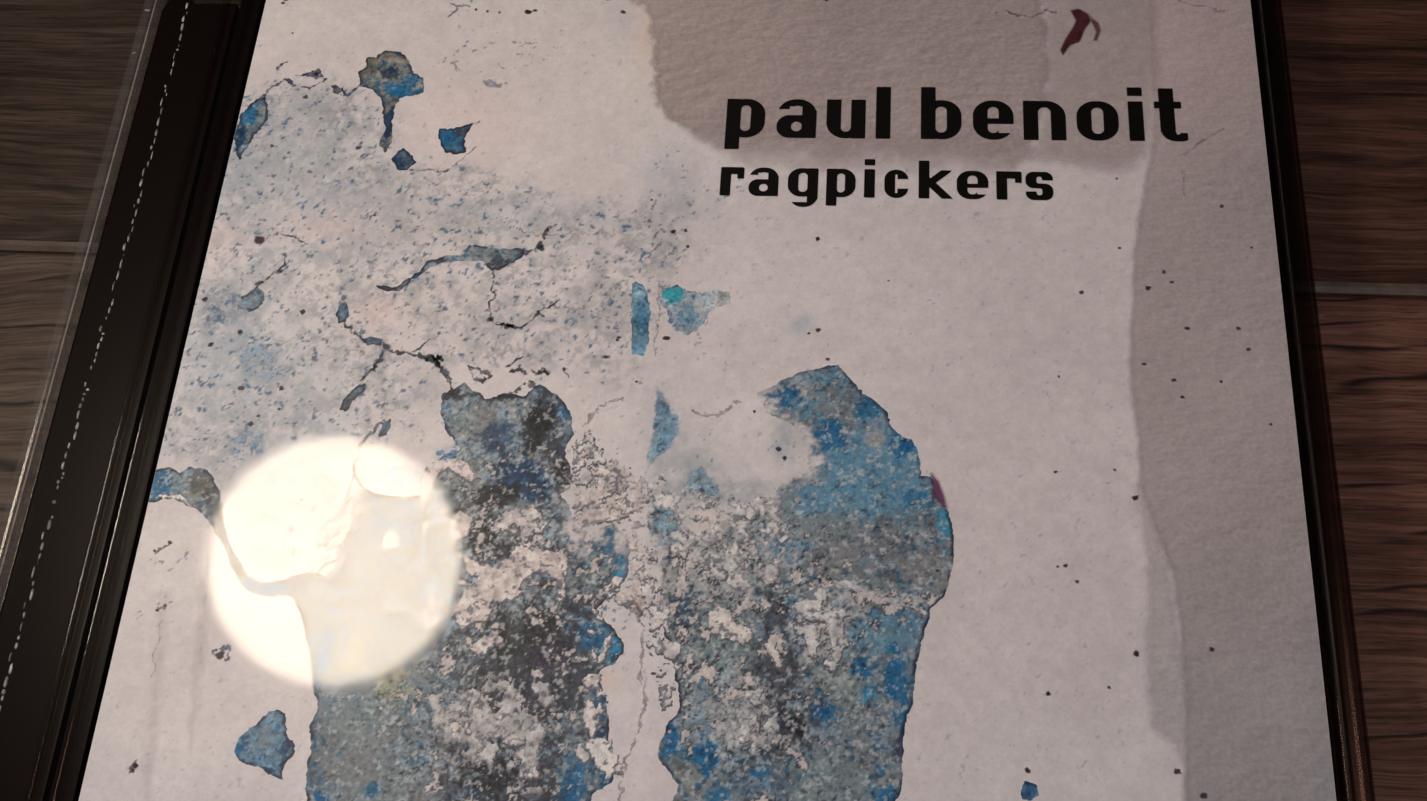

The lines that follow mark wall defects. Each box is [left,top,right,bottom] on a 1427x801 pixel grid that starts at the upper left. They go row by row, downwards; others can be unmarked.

peeling [358,50,424,170]
peeling [438,123,473,155]
crack [522,226,582,255]
crack [344,272,596,400]
crack [582,397,624,427]
crack [692,400,740,417]
peeling [149,365,954,801]
crack [617,596,648,801]
peeling [1021,781,1039,801]